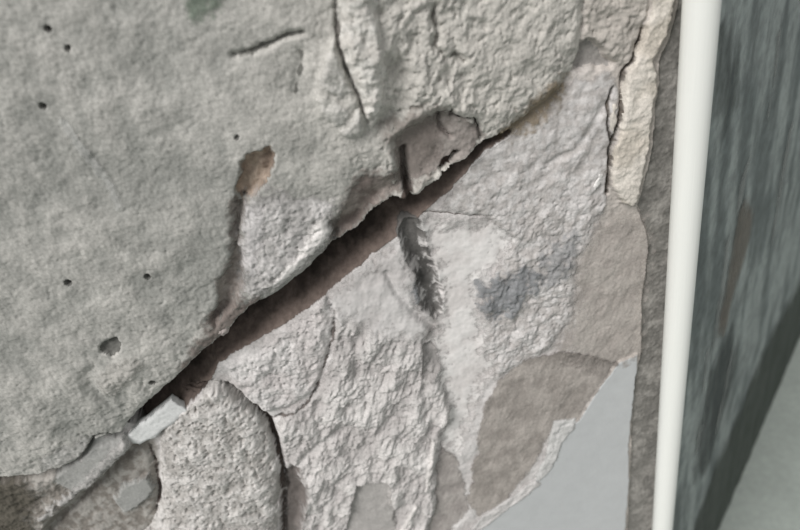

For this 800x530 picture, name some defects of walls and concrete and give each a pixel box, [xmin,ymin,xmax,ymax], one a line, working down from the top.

crack [239,30,304,93]
crack [335,5,364,113]
crack [605,32,641,192]
crack [128,109,511,530]
spalling [209,110,485,319]
spalling [276,0,682,530]
spalling [128,394,187,445]